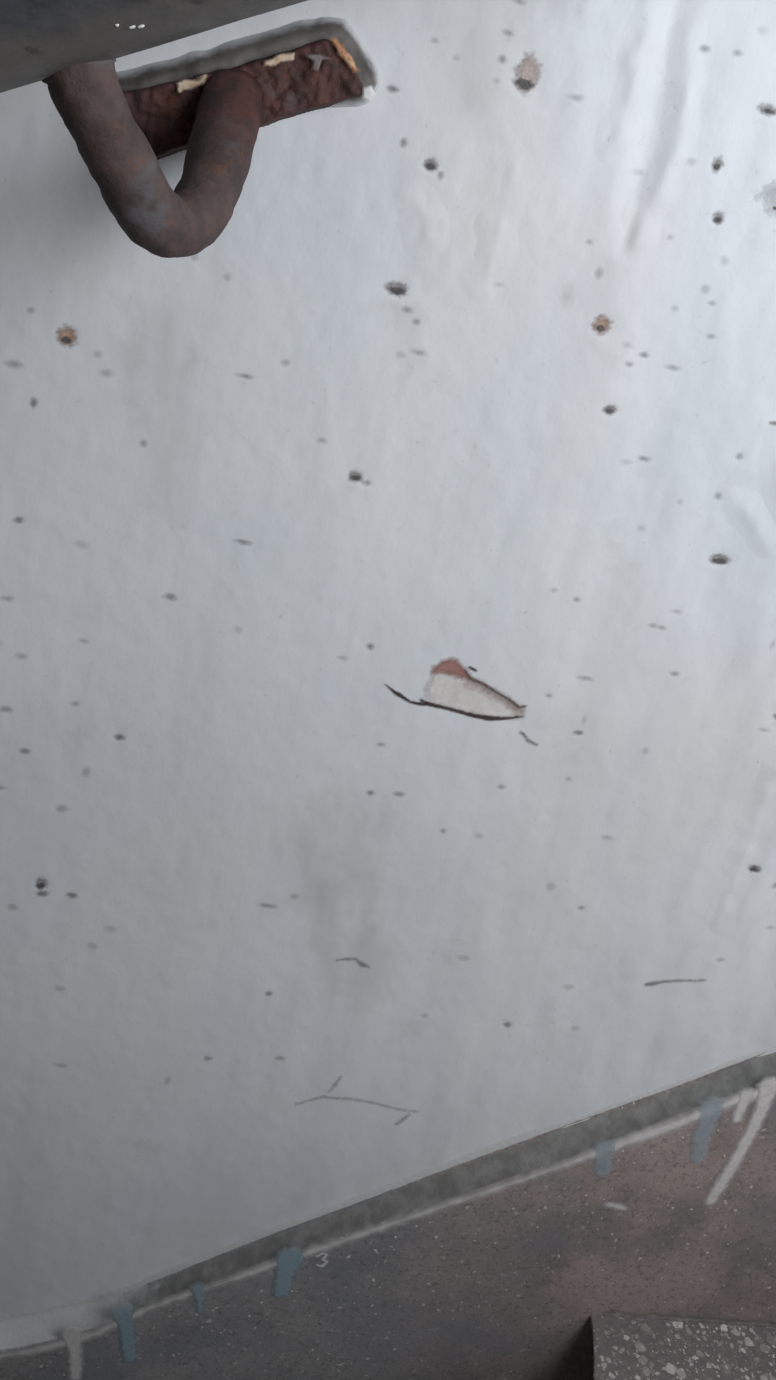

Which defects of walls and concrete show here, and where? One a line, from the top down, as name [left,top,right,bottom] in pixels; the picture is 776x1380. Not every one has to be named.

spalling [517,56,539,92]
peeling [387,659,527,721]